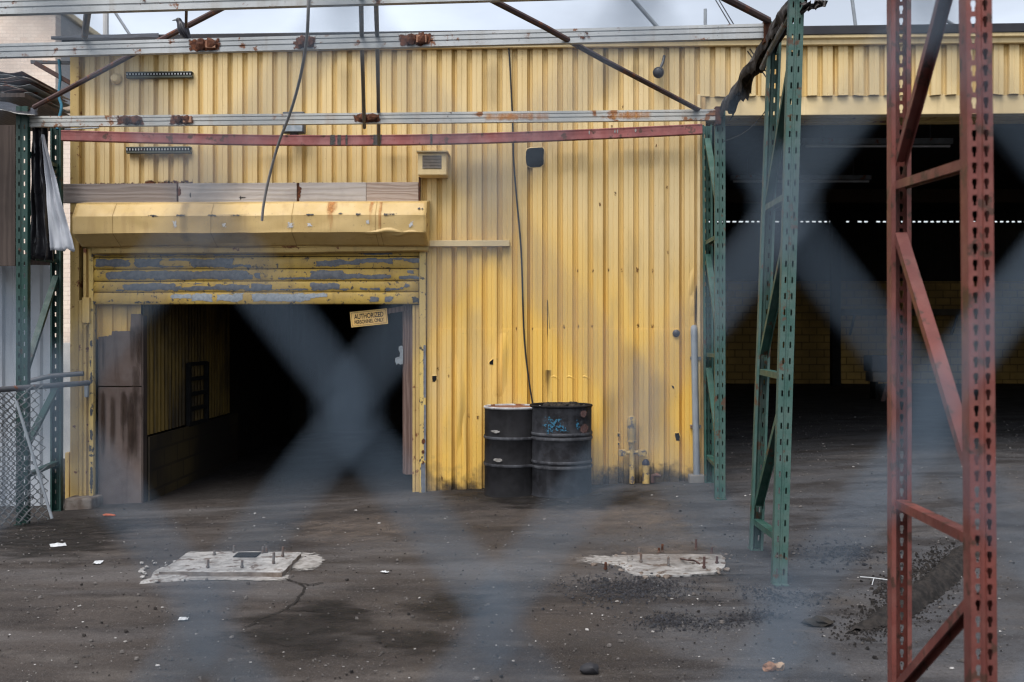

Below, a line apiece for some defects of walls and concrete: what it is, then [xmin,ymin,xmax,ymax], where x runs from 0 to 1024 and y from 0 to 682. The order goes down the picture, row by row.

corrosion [189,37,221,51]
corrosion [117,115,142,125]
corrosion [169,115,193,124]
peeling [94,254,161,291]
peeling [140,254,262,304]
peeling [268,252,419,303]
water stain [101,372,141,448]
crack [244,578,372,627]